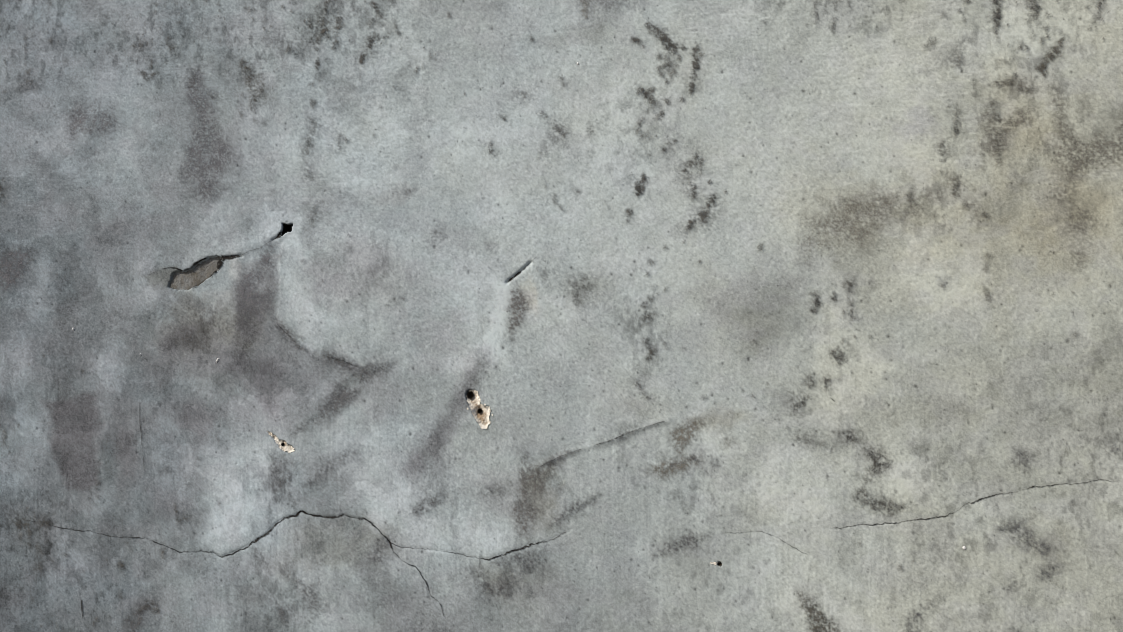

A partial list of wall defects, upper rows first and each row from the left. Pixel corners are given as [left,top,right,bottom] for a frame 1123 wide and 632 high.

damp [637,22,704,116]
damp [687,180,727,229]
spalling [153,256,223,290]
spalling [466,390,493,429]
spalling [267,431,295,453]
crack [836,479,1111,529]
crack [34,510,560,616]